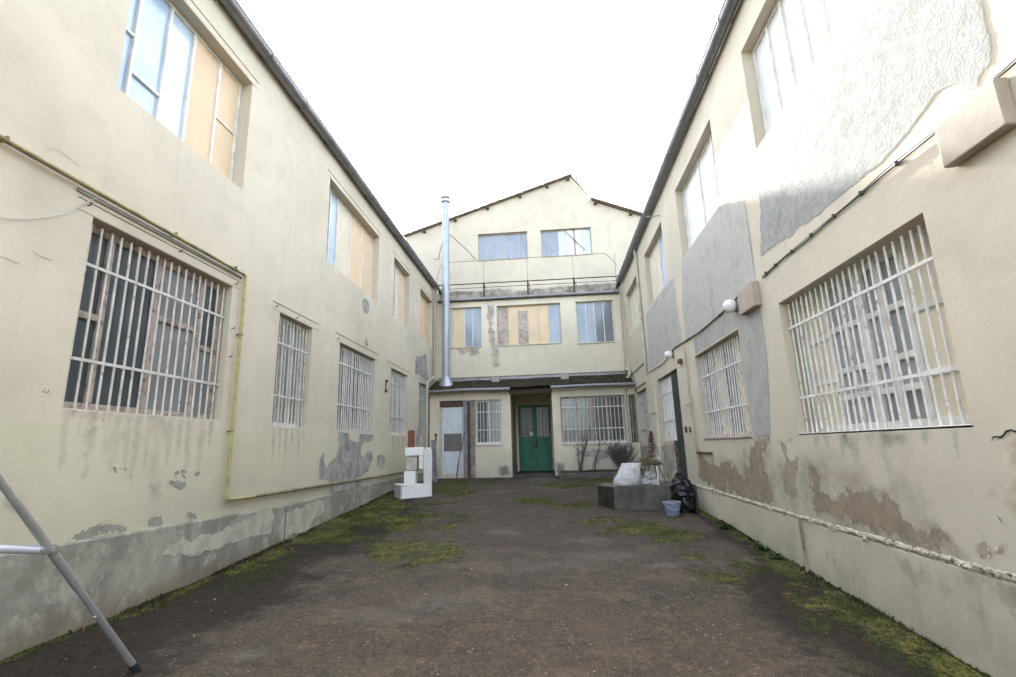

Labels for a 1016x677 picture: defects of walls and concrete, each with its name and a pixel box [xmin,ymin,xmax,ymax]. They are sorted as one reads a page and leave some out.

peeling [69,520,128,542]
peeling [163,431,385,557]
peeling [692,436,1016,583]
crack [991,429,1016,442]